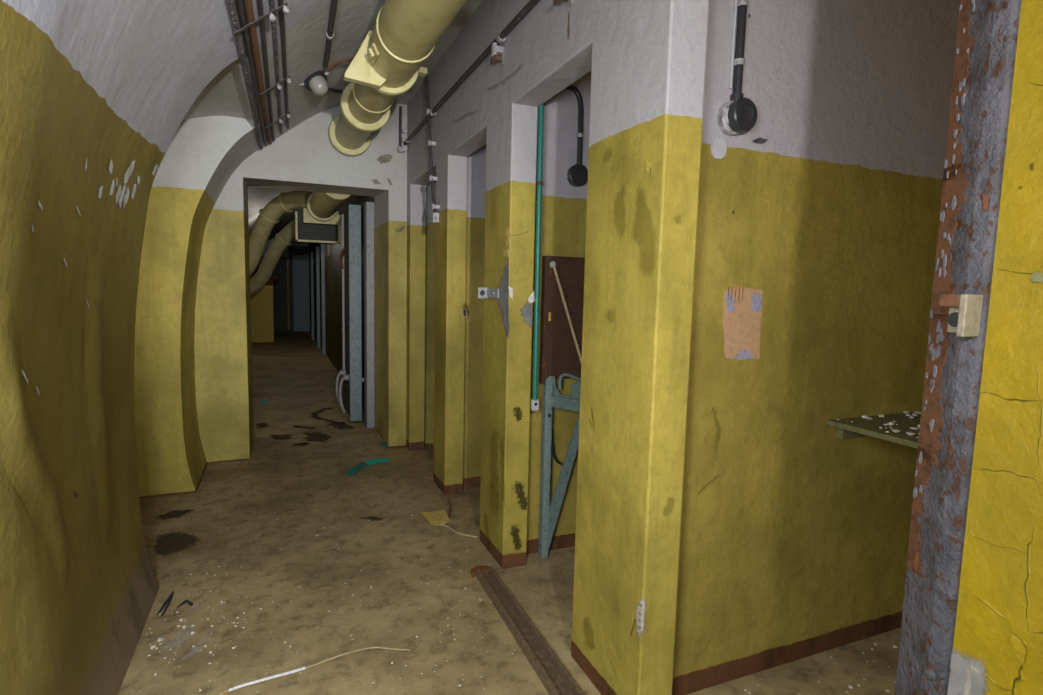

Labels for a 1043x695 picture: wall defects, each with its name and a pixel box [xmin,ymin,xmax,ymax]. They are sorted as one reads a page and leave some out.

rust [907,0,976,578]
crack [998,265,1043,282]
crack [973,363,1043,490]
crack [968,521,1043,695]